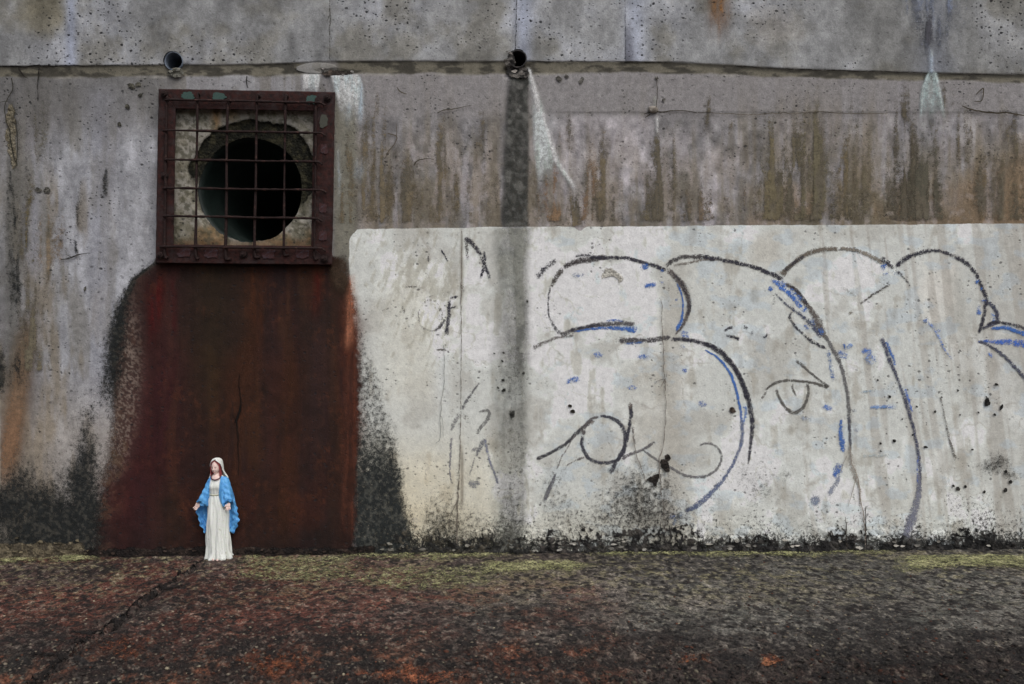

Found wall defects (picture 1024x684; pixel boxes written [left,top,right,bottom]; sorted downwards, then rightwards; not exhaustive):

water stain [0,107,78,392]
water stain [0,263,157,551]
rust [90,256,363,550]
water stain [353,70,623,555]
water stain [544,466,689,546]
water stain [640,0,1024,221]
water stain [977,452,1015,479]